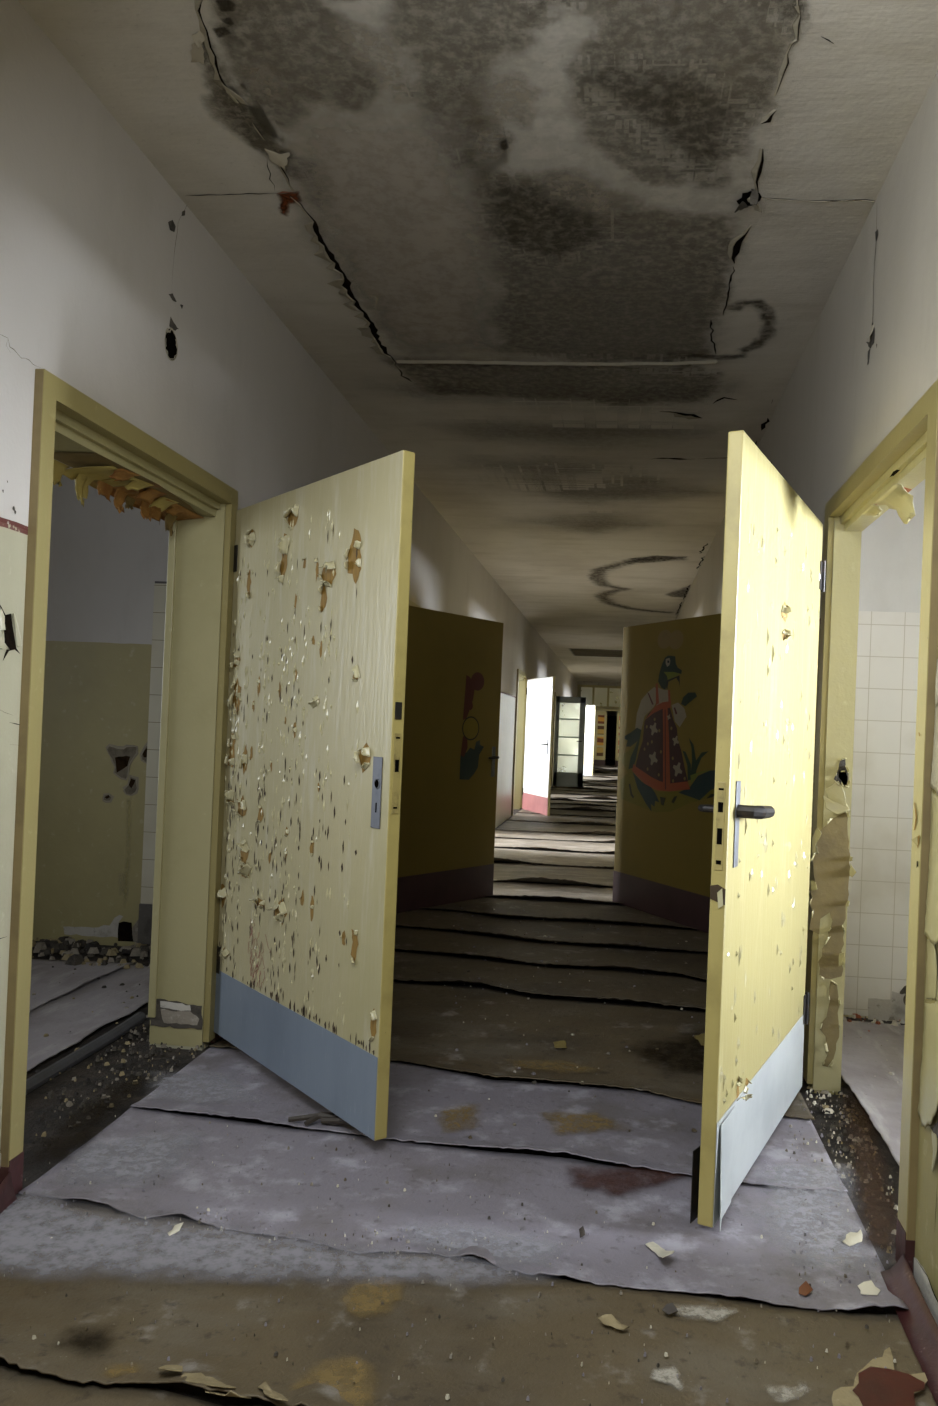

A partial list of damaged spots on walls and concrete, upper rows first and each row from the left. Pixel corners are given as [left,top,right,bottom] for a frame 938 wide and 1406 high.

crack [168,0,412,382]
damp [213,0,802,404]
crack [710,0,878,365]
peeling [53,452,204,536]
peeling [861,484,915,524]
damp [590,556,687,613]
peeling [757,602,820,703]
spalling [102,741,148,898]
flaking render [63,915,138,942]
peeling [717,757,856,1067]
peeling [912,704,938,1172]
peeling [720,946,770,1104]